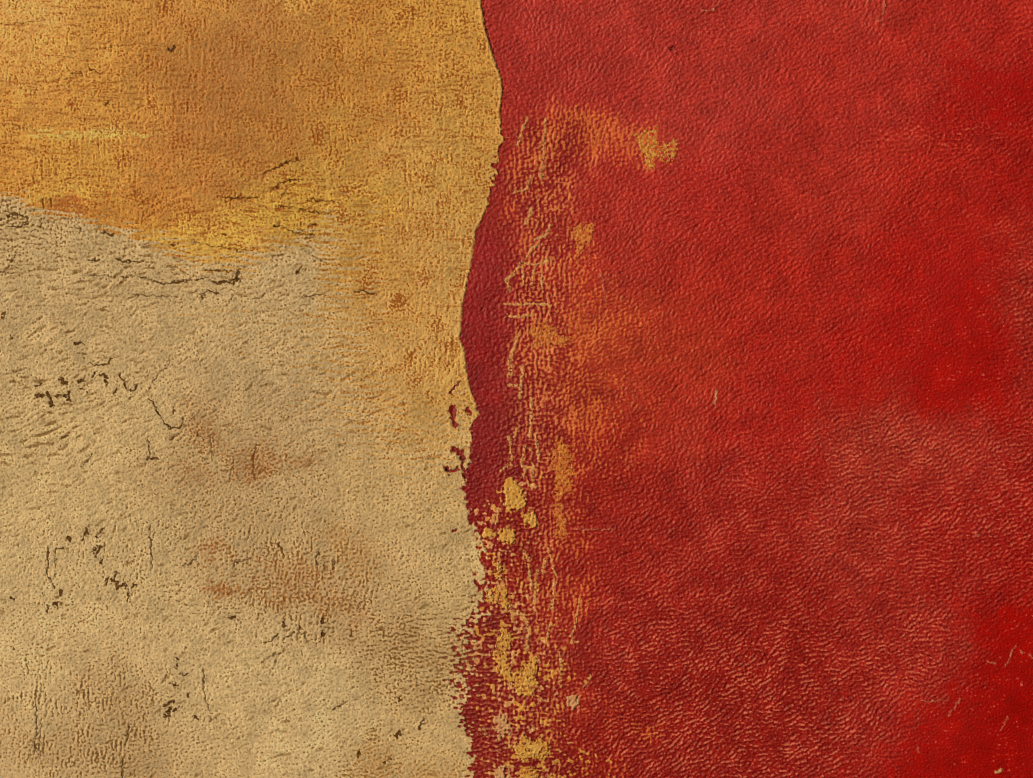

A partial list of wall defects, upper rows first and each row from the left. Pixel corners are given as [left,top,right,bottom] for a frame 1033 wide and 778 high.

peeling [513,118,547,193]
peeling [634,126,678,172]
peeling [569,222,595,260]
peeling [448,381,472,428]
peeling [444,446,468,481]
peeling [482,224,575,698]
peeling [566,674,591,711]
peeling [483,714,553,778]